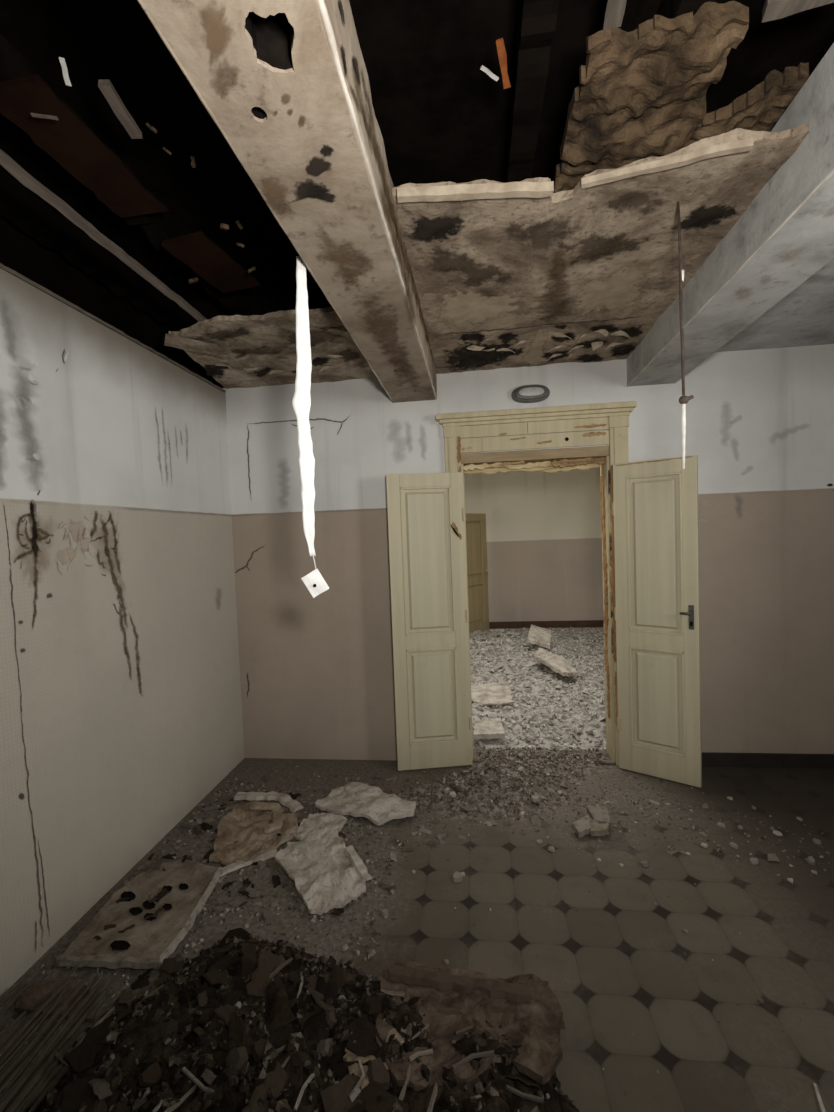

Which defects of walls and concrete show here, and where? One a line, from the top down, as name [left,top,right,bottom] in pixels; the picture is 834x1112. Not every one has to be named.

spalling [245,12,294,70]
spalling [341,45,361,86]
spalling [251,107,267,119]
leakage [293,145,335,202]
leakage [351,69,531,372]
leakage [673,205,736,230]
leakage [508,220,649,320]
leakage [310,327,359,361]
flaking render [436,290,522,325]
flaking render [522,265,650,367]
crack [247,418,347,495]
crack [3,503,50,950]